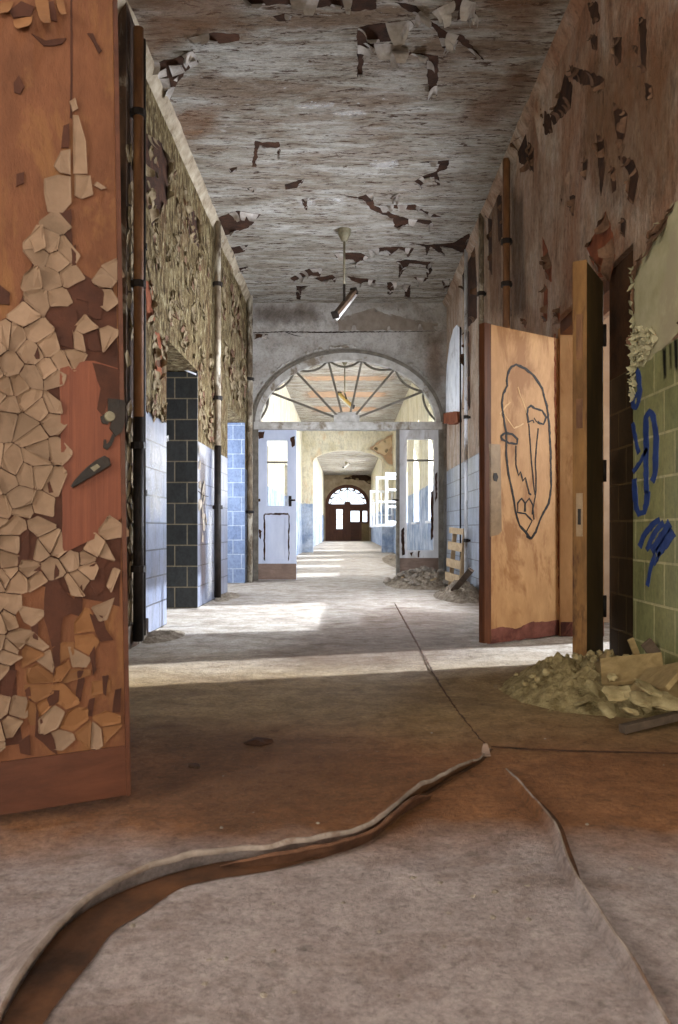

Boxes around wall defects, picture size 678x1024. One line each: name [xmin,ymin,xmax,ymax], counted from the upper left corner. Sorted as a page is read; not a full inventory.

peeling [0,0,66,46]
spalling [153,32,240,100]
peeling [241,0,377,21]
peeling [356,0,484,100]
peeling [540,65,605,135]
peeling [252,141,281,167]
peeling [285,178,308,210]
peeling [414,160,449,189]
peeling [580,102,639,204]
peeling [626,201,678,402]
peeling [0,98,133,755]
crack [0,604,678,1024]